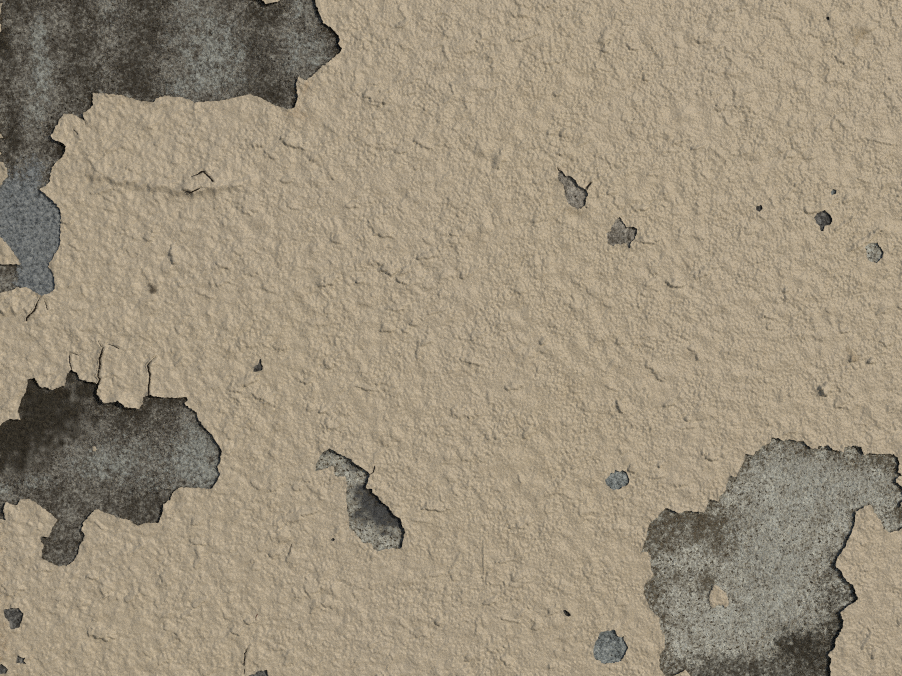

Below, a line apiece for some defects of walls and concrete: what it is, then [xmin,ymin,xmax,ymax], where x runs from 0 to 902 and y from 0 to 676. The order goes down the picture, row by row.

peeling [0,0,345,298]
peeling [555,167,590,211]
peeling [604,214,641,251]
peeling [812,207,835,233]
peeling [863,240,886,266]
crack [69,341,119,385]
crack [145,359,153,396]
peeling [0,367,225,568]
peeling [312,446,408,553]
peeling [602,466,633,492]
peeling [638,435,902,676]
peeling [590,626,630,667]